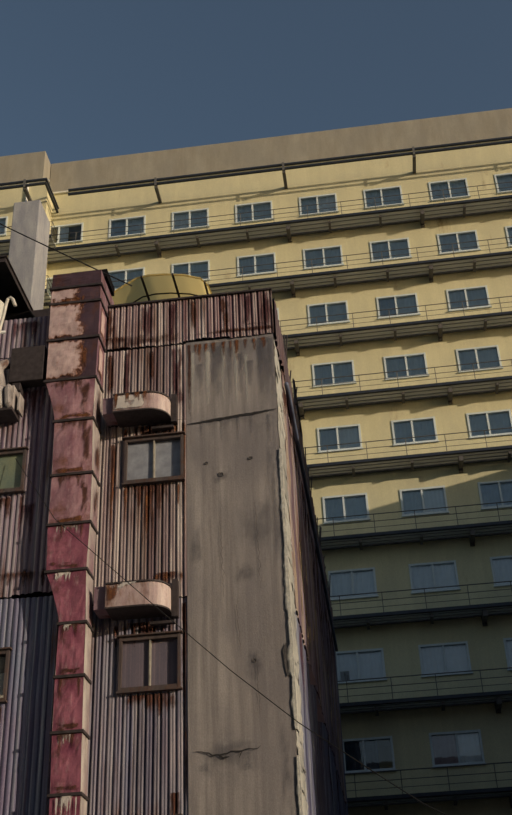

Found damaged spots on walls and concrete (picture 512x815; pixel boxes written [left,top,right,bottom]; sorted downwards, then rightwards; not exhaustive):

peeling [46,288,86,379]
corrosion [22,389,45,423]
corrosion [54,294,272,535]
spalling [278,448,298,729]
crack [195,746,260,759]